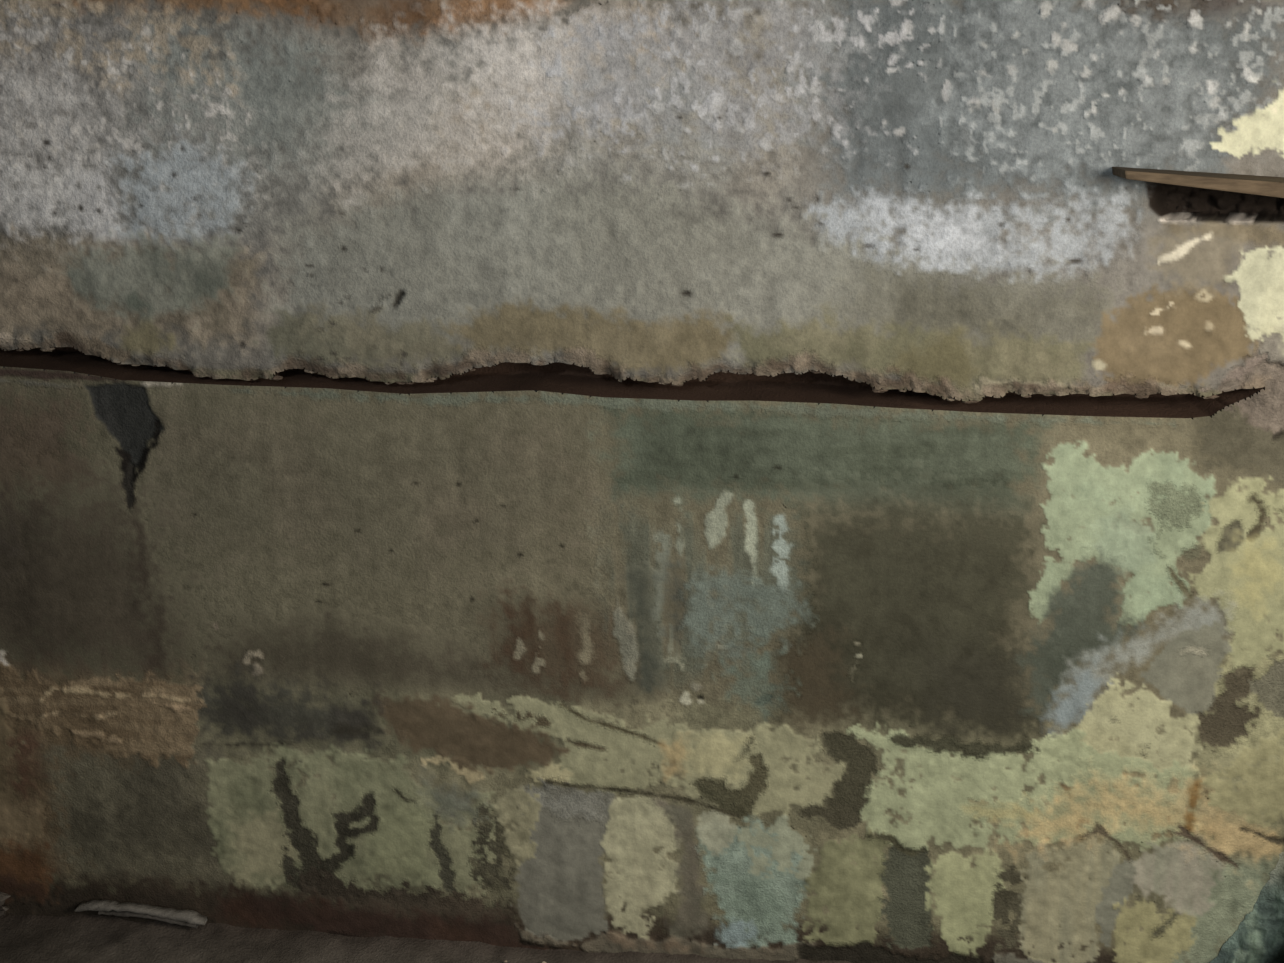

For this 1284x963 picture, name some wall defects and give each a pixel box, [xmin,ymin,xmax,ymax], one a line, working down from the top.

peeling [1208,77,1284,160]
spalling [50,203,104,218]
crack [0,327,1273,418]
damp [0,0,1284,431]
spalling [679,289,694,298]
spalling [1067,256,1084,265]
peeling [1087,211,1284,444]
spalling [83,379,168,515]
damp [572,459,1243,759]
peeling [0,439,1284,963]